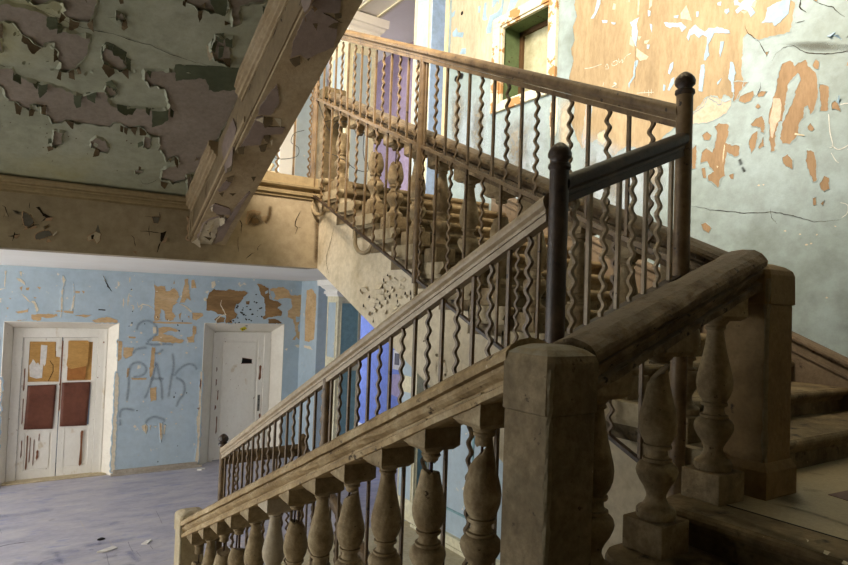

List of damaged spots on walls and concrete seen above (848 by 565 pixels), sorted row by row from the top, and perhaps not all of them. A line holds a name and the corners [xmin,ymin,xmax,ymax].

peeling [289,0,343,67]
peeling [450,0,530,62]
crack [745,28,846,54]
peeling [0,0,285,247]
peeling [568,0,841,188]
peeling [804,148,830,206]
peeling [0,271,119,324]
peeling [109,278,317,473]